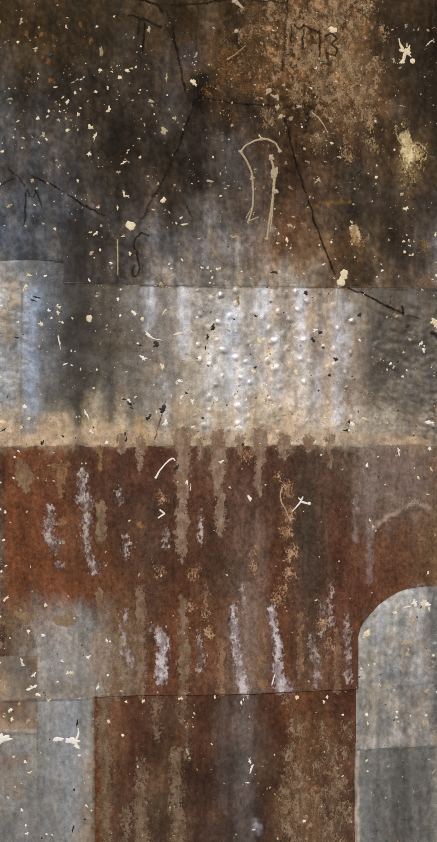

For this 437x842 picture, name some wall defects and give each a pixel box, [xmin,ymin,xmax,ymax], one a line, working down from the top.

crack [3,172,105,216]
damp [0,191,144,511]
damp [150,32,259,200]
crack [141,0,335,274]
damp [235,211,283,254]
crack [348,288,412,317]
damp [105,276,437,842]
damp [34,689,85,838]